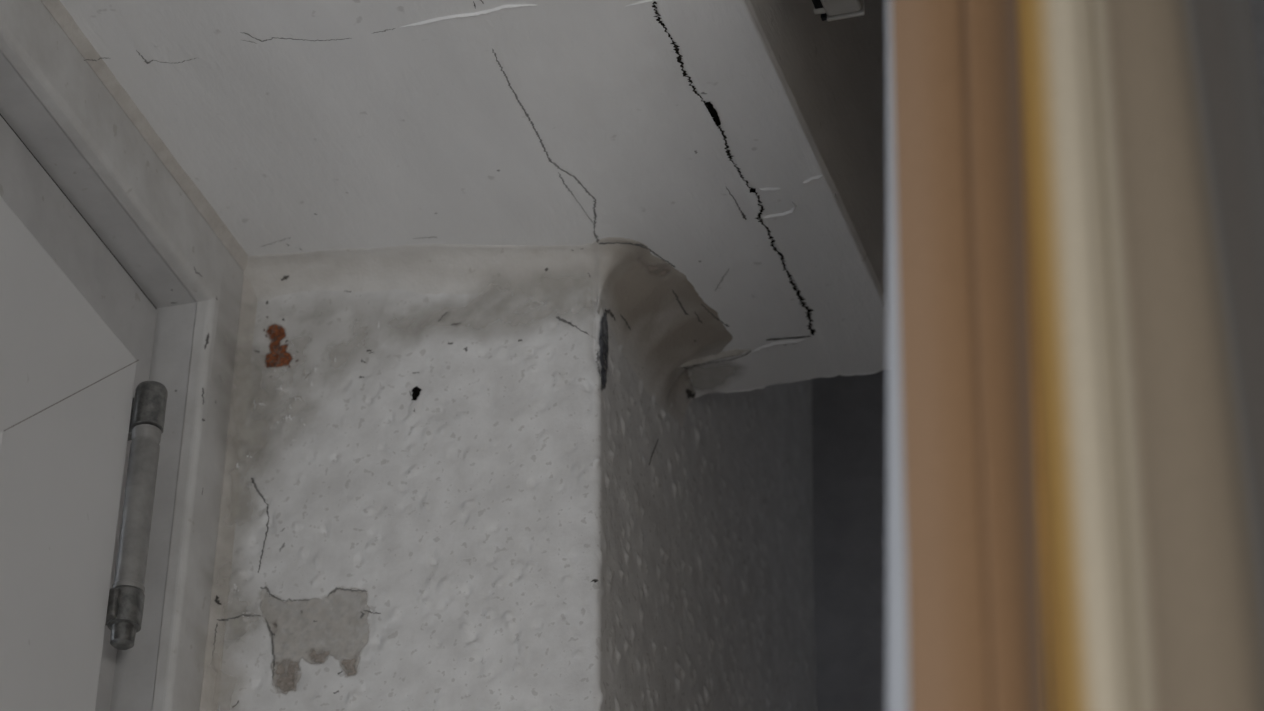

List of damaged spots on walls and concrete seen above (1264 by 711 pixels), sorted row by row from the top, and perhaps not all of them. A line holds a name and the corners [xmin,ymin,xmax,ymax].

crack [492,50,599,243]
crack [652,1,816,341]
rust [263,316,298,377]
peeling [260,587,369,694]